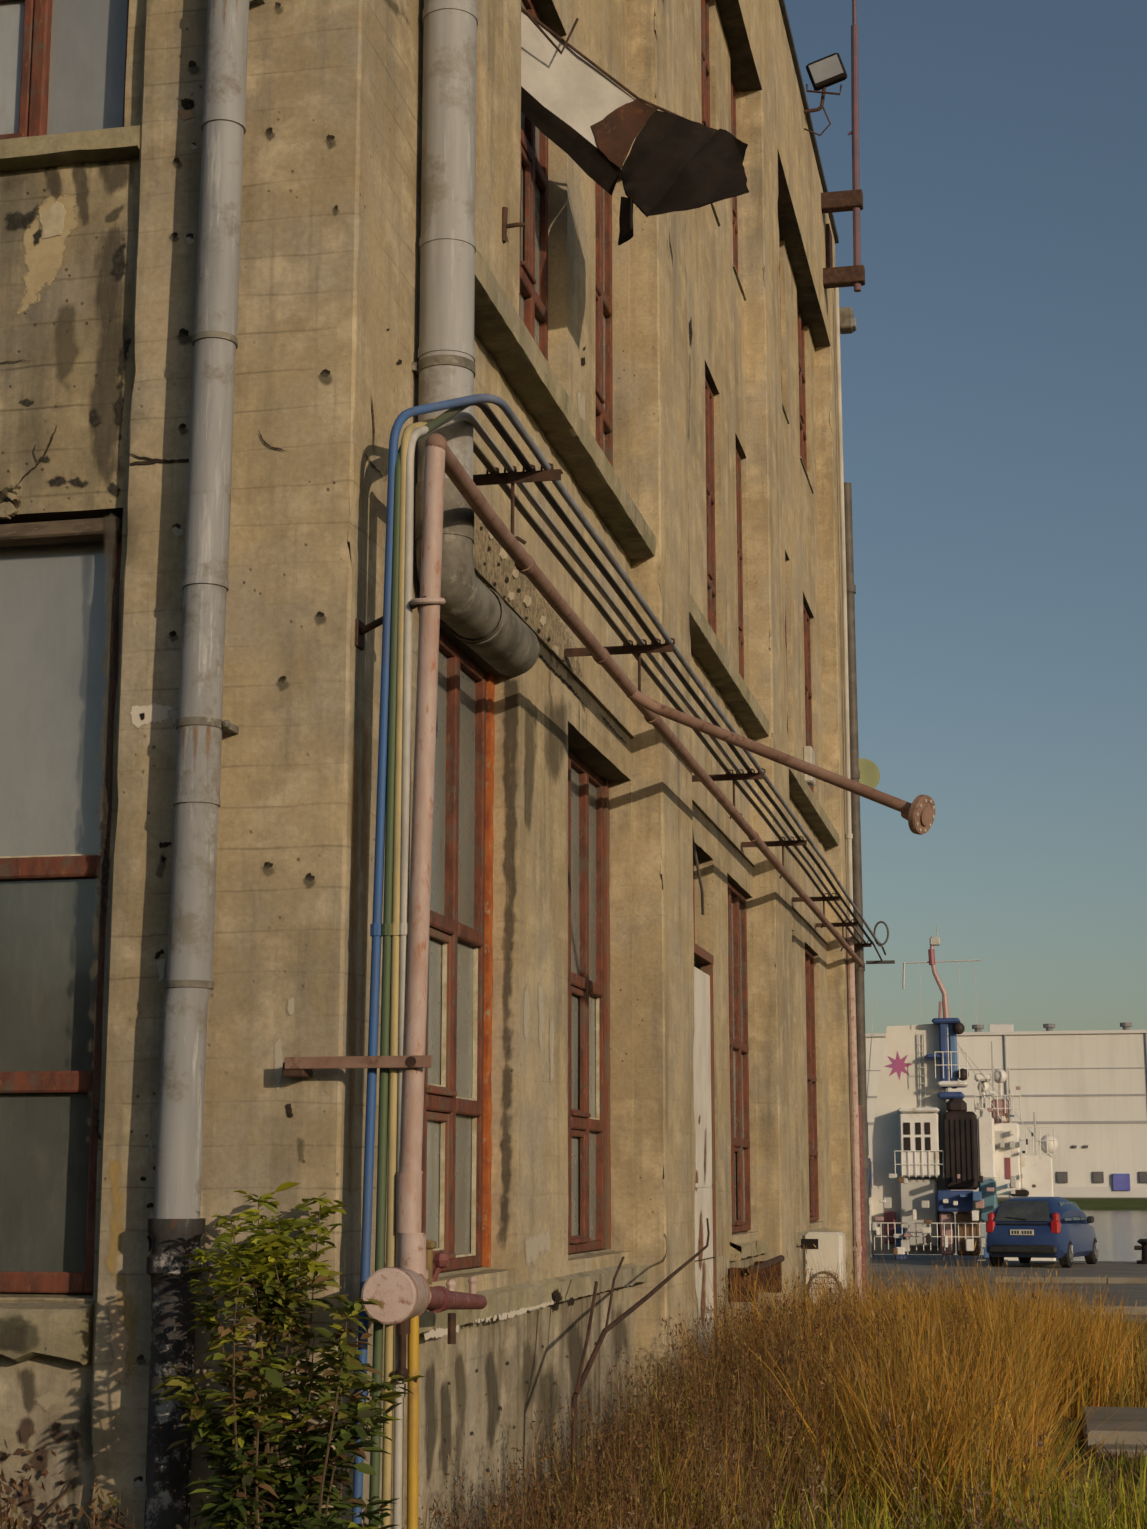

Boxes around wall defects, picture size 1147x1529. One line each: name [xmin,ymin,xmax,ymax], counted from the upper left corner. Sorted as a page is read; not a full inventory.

leakage [5,205,41,246]
peeling [16,192,79,315]
leakage [38,163,132,496]
peeling [0,486,21,519]
peeling [473,516,582,679]
leakage [90,515,118,979]
leakage [0,1316,39,1411]
leakage [426,1324,597,1479]